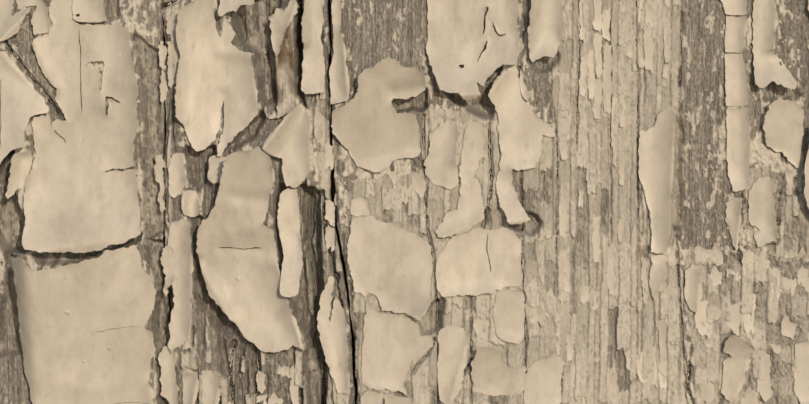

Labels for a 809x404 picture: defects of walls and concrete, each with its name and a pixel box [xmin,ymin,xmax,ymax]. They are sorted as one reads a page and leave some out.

peeling [0,0,615,404]
peeling [578,0,626,186]
peeling [610,0,809,404]